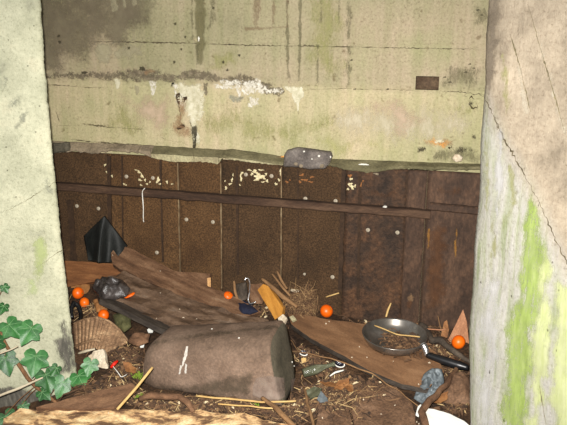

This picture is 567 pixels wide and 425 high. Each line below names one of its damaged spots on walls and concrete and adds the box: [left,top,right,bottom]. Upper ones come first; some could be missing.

water stain [41,0,147,69]
water stain [195,0,206,63]
efflorescence [216,78,304,111]
crack [440,90,567,264]
water stain [500,200,567,425]